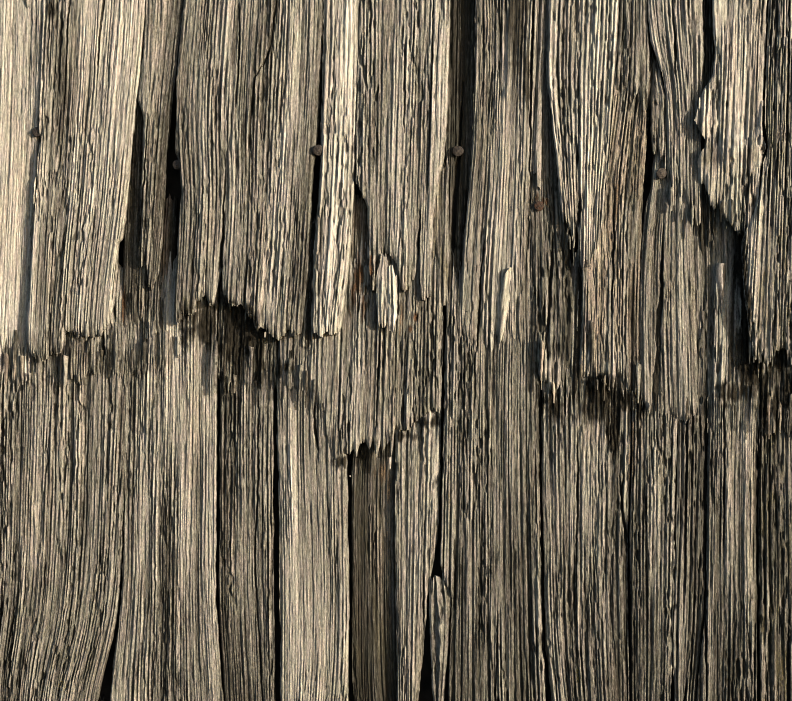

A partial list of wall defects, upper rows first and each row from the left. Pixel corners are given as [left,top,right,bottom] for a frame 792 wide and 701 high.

crack [138,113,148,252]